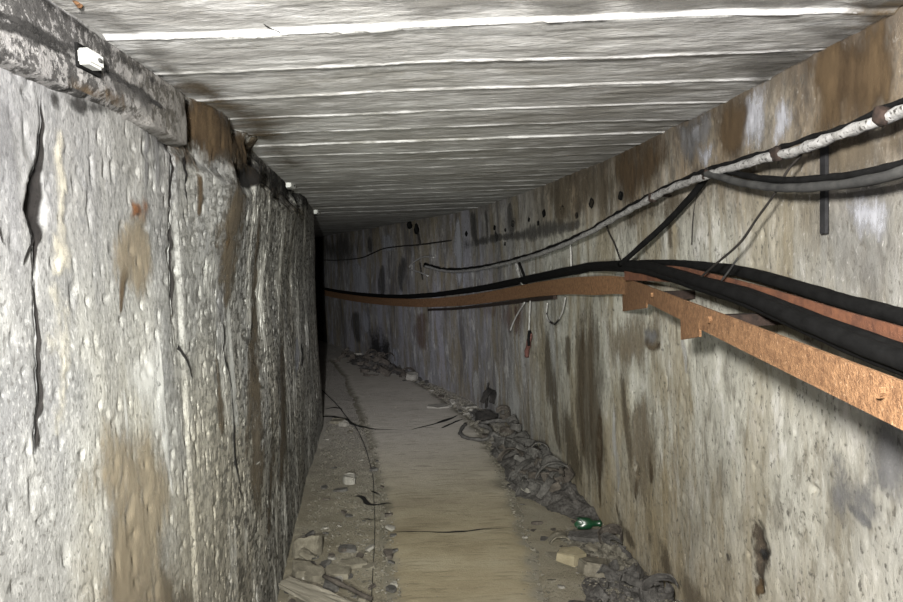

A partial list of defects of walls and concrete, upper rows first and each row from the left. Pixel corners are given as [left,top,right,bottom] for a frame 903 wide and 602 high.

leakage [720,51,801,155]
crack [23,104,68,450]
corrosion [114,203,151,312]
leakage [453,141,682,285]
efflorescence [855,201,886,233]
leakage [351,311,398,366]
leakage [545,312,658,506]
leakage [833,481,873,528]
leakage [875,425,903,489]
leakage [661,550,670,574]